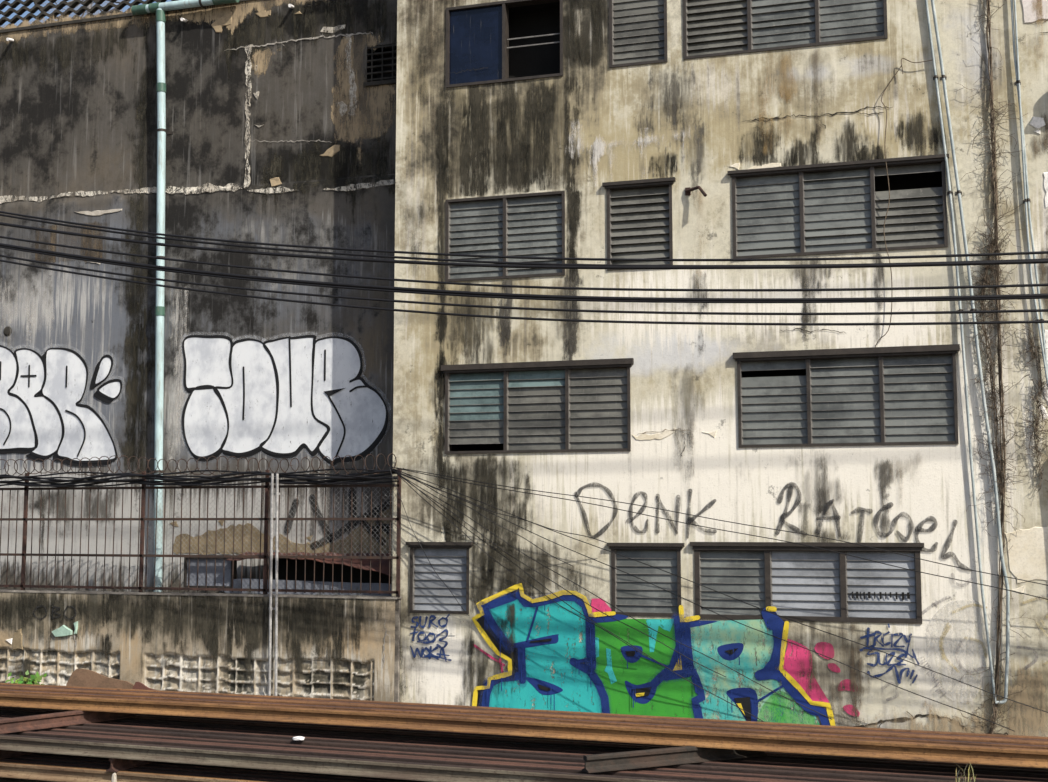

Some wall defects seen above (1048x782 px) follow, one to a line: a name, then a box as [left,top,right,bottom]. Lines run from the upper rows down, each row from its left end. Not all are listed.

peeling [1021,0,1048,23]
flaking render [308,25,396,160]
water stain [739,121,885,166]
crack [742,106,892,129]
water stain [897,112,946,156]
water stain [80,222,103,262]
water stain [88,17,157,491]
water stain [435,73,606,680]
water stain [0,593,89,640]
water stain [102,588,364,693]
water stain [21,657,31,682]
water stain [456,630,488,706]